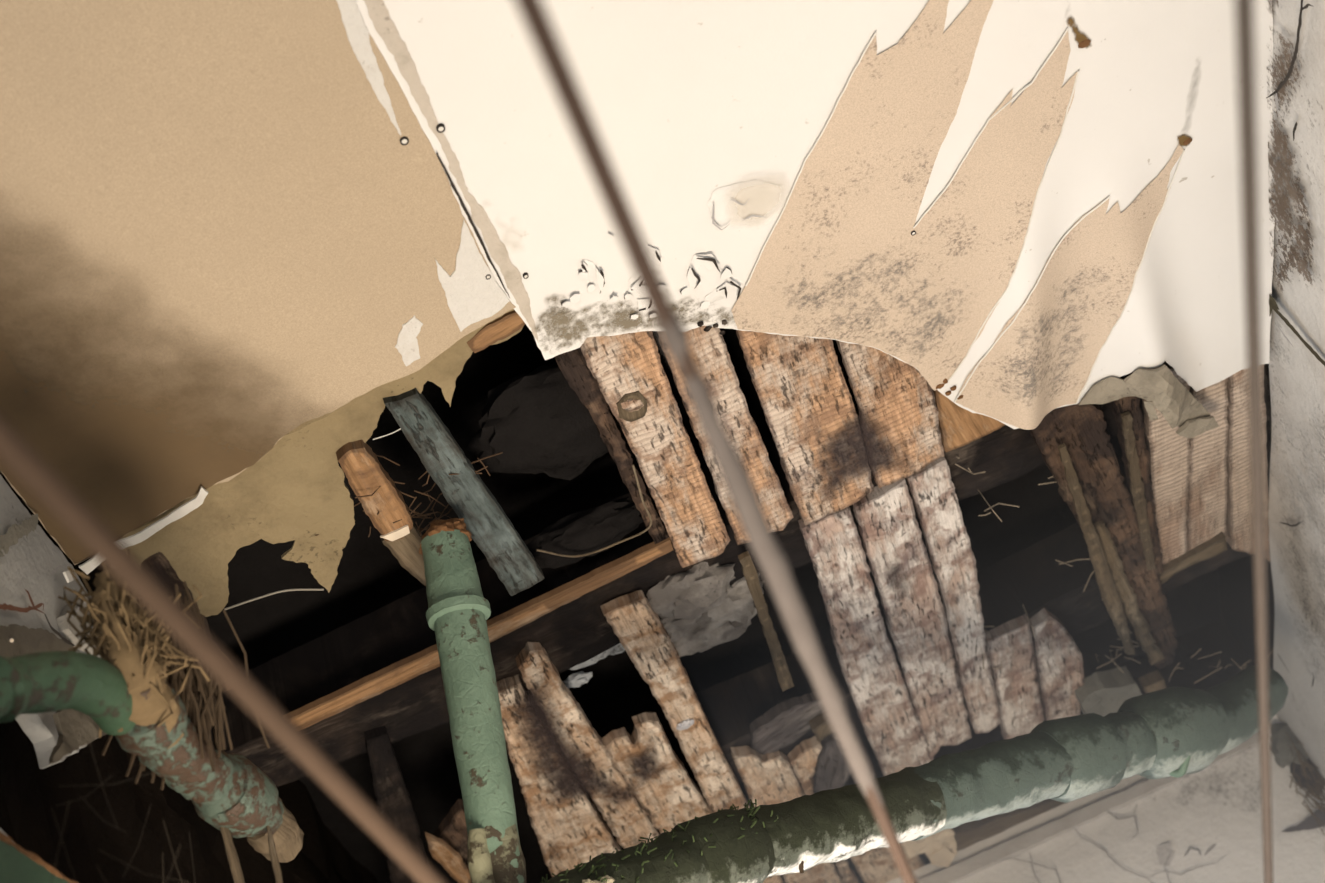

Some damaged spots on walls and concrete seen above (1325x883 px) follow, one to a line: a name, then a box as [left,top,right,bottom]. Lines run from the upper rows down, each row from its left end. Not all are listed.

corrosion [1067,18,1091,48]
damp [1267,0,1315,292]
peeling [663,0,1185,430]
peeling [648,246,662,262]
peeling [395,315,423,366]
damp [536,297,655,348]
damp [673,301,733,324]
damp [0,286,282,539]
spalling [0,596,101,658]